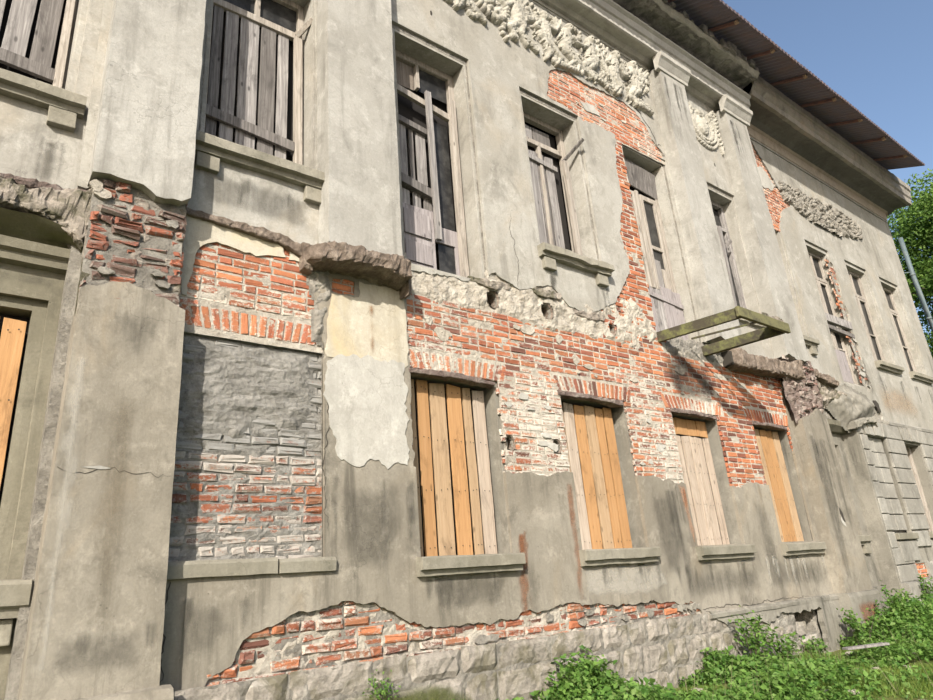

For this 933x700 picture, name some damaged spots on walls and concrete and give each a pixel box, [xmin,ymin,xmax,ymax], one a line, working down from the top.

flaking render [74,179,324,354]
flaking render [406,70,847,488]
crack [58,465,166,478]
flaking render [205,601,700,686]